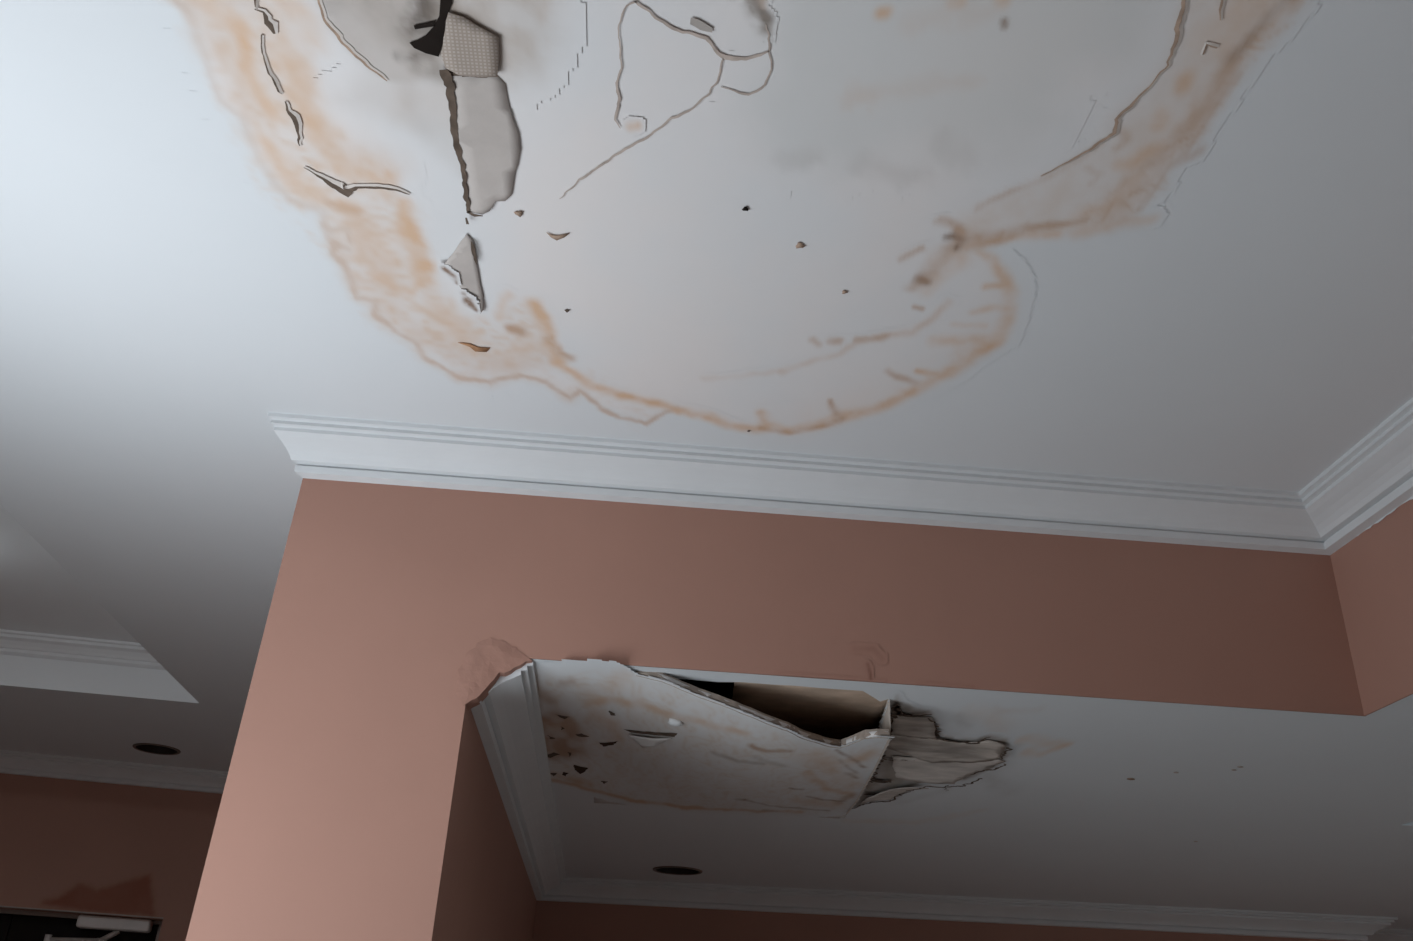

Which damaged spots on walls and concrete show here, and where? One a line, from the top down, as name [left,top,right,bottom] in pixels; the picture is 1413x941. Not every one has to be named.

crack [254,0,410,197]
peeling [293,0,587,215]
crack [560,1,772,199]
crack [1041,0,1226,177]
peeling [438,233,483,314]
leakage [142,0,1321,448]
peeling [852,691,1015,810]